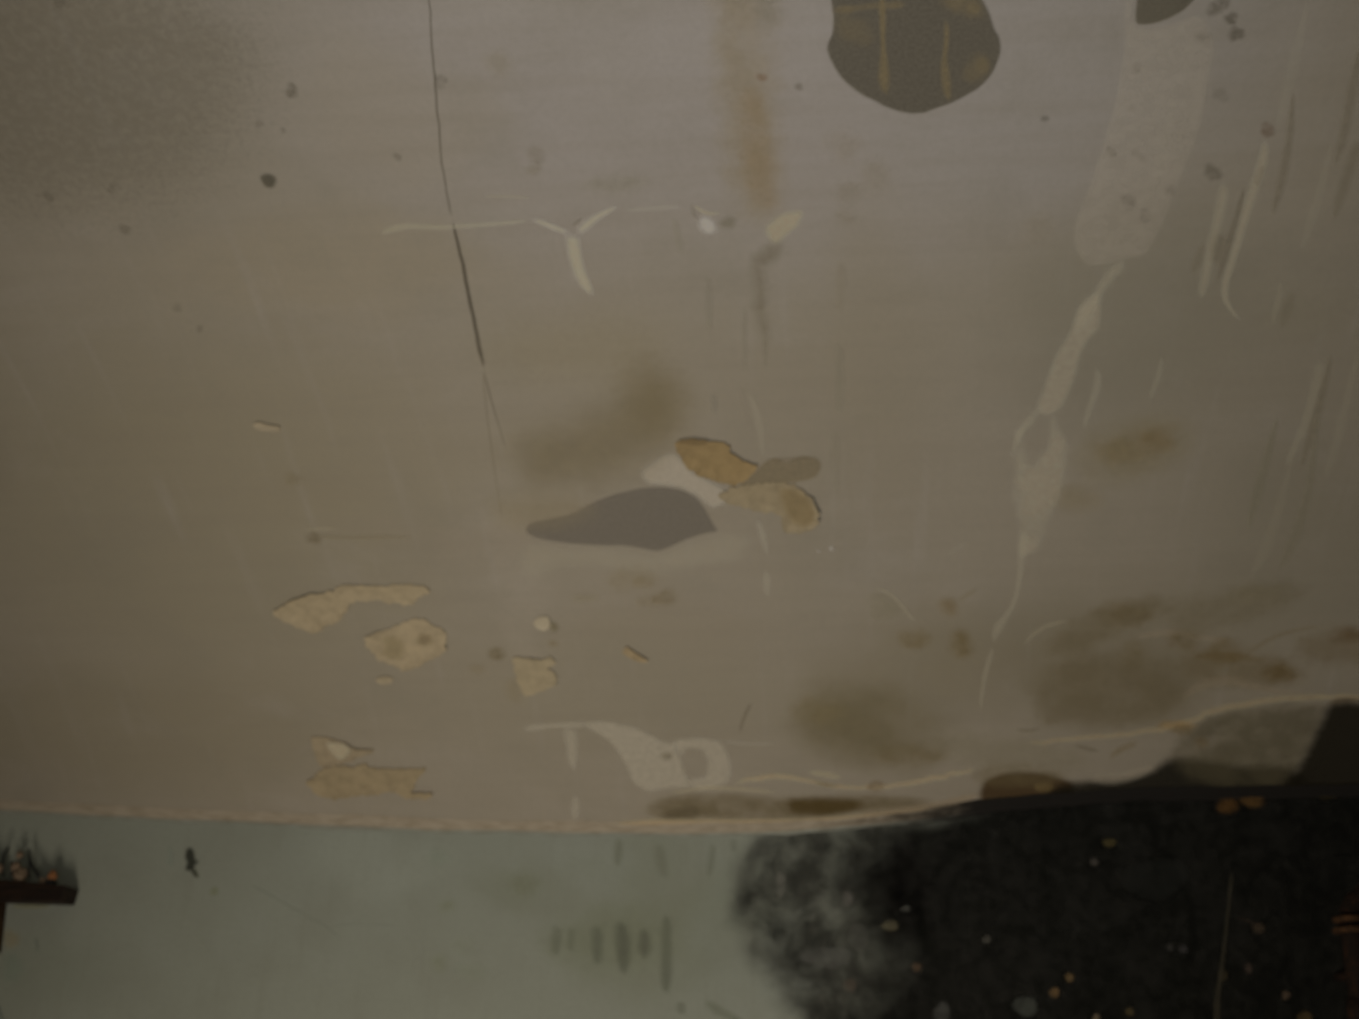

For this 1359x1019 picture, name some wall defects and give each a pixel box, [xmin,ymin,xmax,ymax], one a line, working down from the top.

spalling [828,0,1000,113]
spalling [1136,0,1193,24]
crack [454,228,483,362]
spalling [527,438,820,551]
peeling [273,583,447,671]
peeling [311,737,374,768]